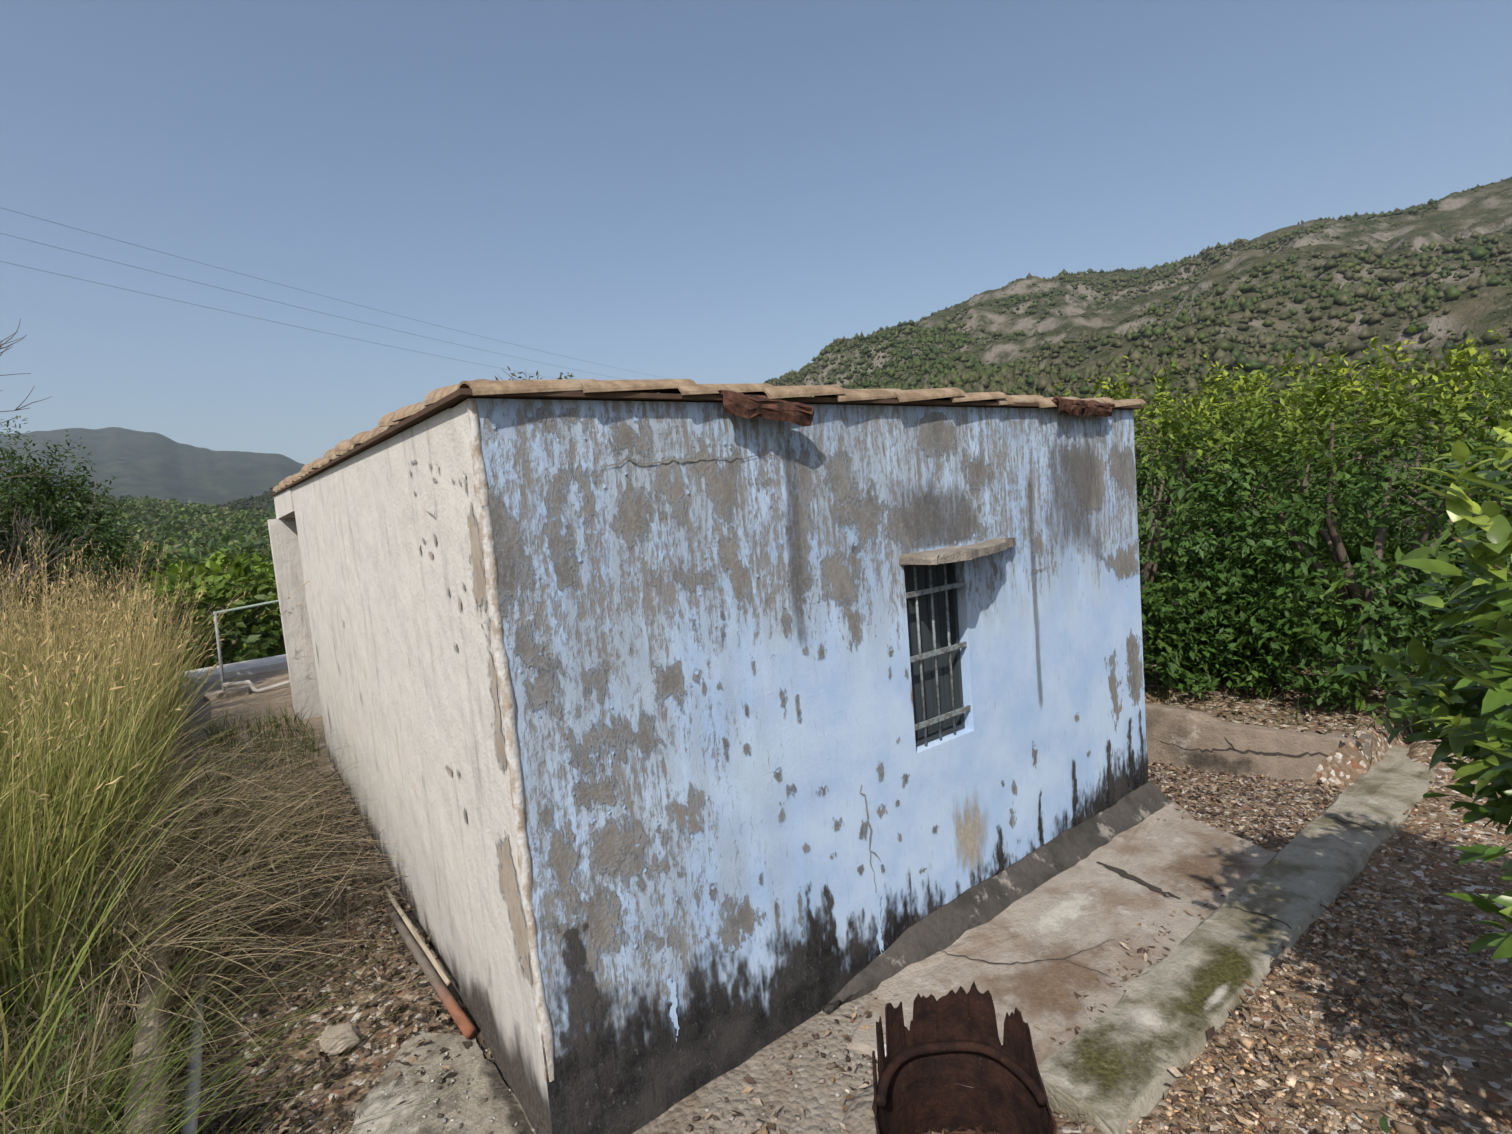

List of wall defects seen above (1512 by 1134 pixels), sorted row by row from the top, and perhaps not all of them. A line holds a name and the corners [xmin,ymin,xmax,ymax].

spalling [711,390,814,426]
spalling [1051,395,1115,417]
peeling [1059,441,1136,517]
peeling [1100,535,1139,580]
peeling [1104,629,1144,731]
peeling [409,408,998,1000]
crack [1161,738,1328,758]
peeling [1001,780,1017,828]
crack [1097,861,1181,899]
leakage [327,710,1149,1134]
leakage [1130,1008,1160,1026]
leakage [1209,987,1226,1004]